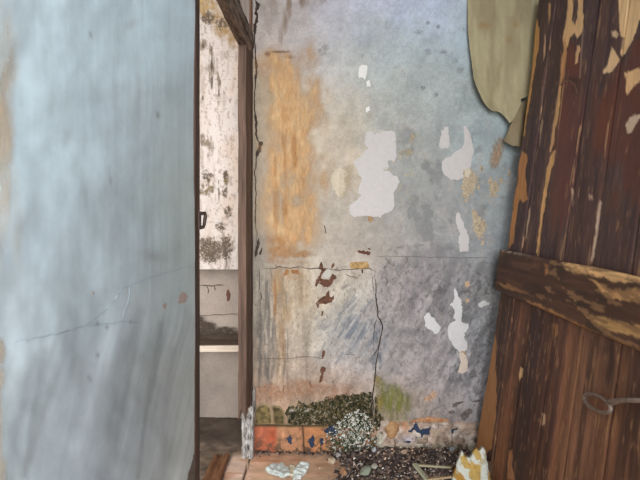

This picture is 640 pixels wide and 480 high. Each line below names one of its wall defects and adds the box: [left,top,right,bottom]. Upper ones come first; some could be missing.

water stain [200,0,236,44]
water stain [200,40,221,96]
peeling [358,65,371,87]
water stain [200,170,228,197]
water stain [200,206,233,264]
crack [253,0,481,420]
peeling [349,130,400,222]
peeling [439,126,484,203]
peeling [456,209,488,252]
peeling [424,289,470,374]